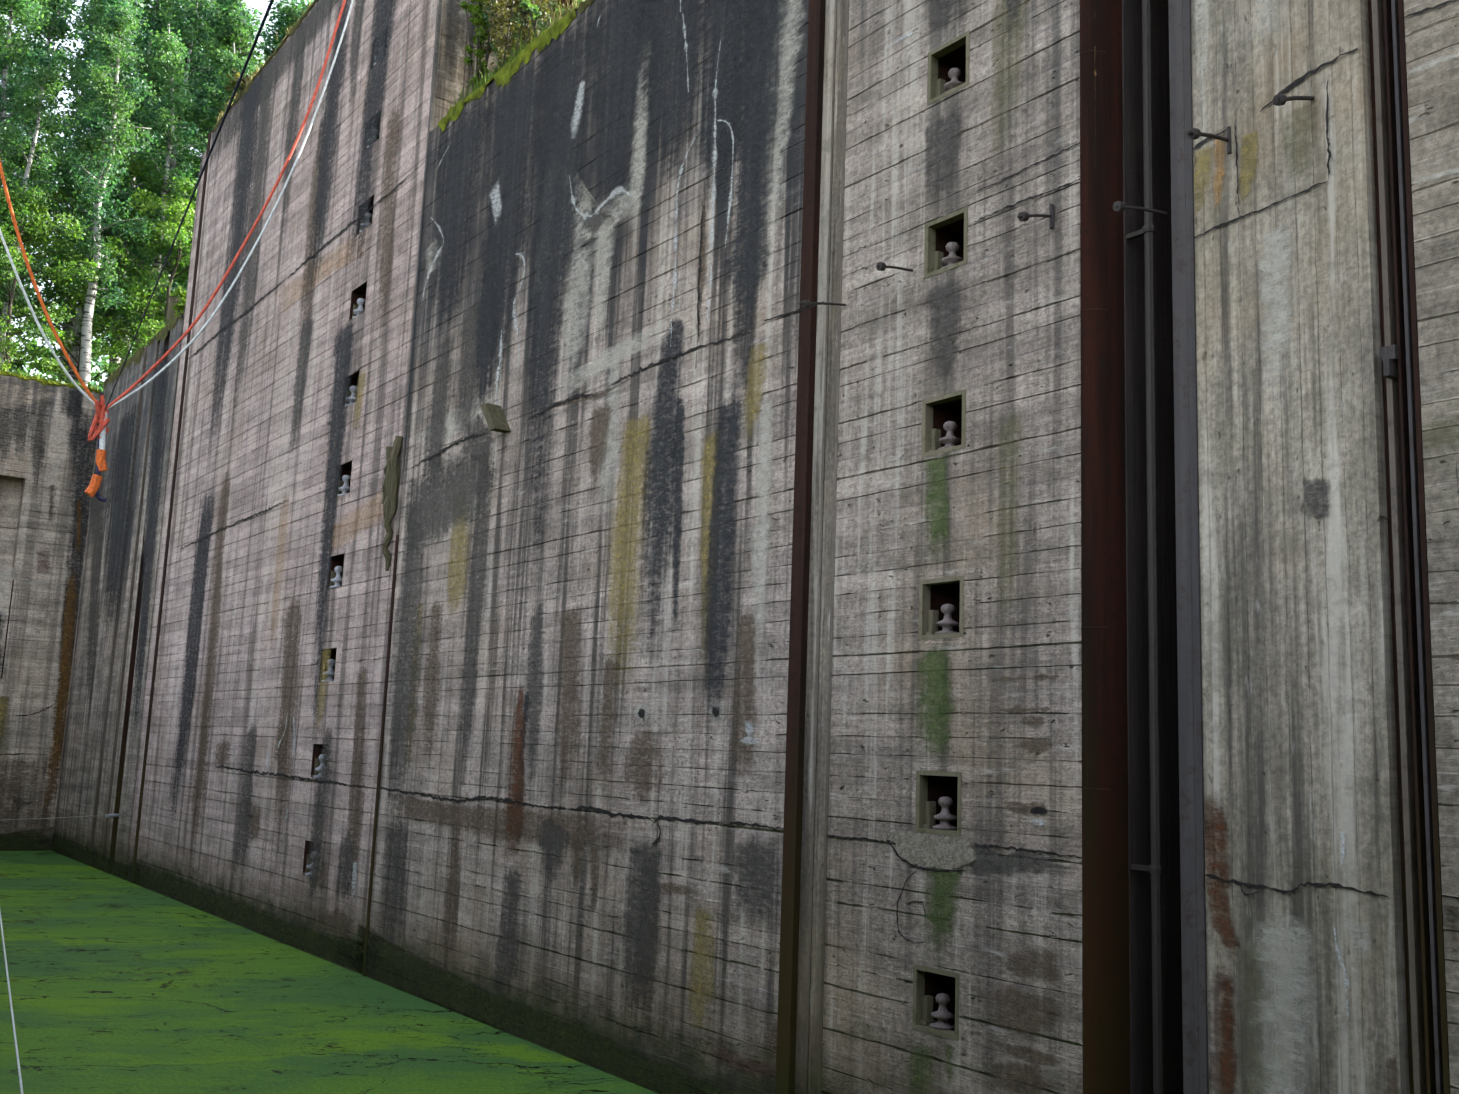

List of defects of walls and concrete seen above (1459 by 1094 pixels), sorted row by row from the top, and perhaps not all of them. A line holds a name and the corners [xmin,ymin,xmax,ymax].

leakage [0,350,169,827]
leakage [171,473,230,843]
crack [181,500,288,549]
leakage [233,324,366,939]
leakage [209,0,400,451]
crack [215,765,784,845]
leakage [382,463,661,1004]
leakage [421,0,799,799]
leakage [734,837,781,920]
crack [827,834,893,843]
crack [896,868,925,944]
crack [974,844,1082,858]